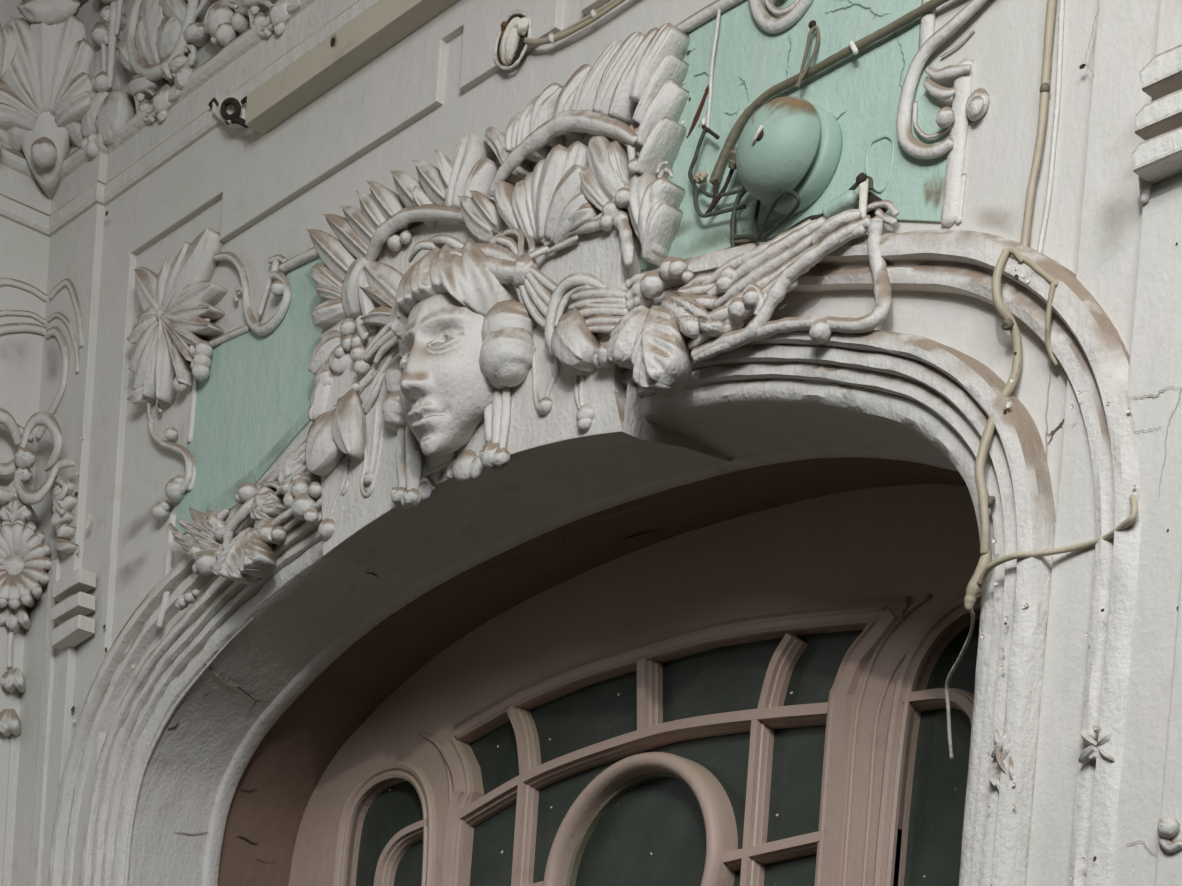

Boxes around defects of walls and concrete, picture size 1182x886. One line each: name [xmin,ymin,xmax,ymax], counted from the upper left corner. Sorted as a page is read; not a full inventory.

crack [825,0,905,90]
crack [1130,386,1182,489]